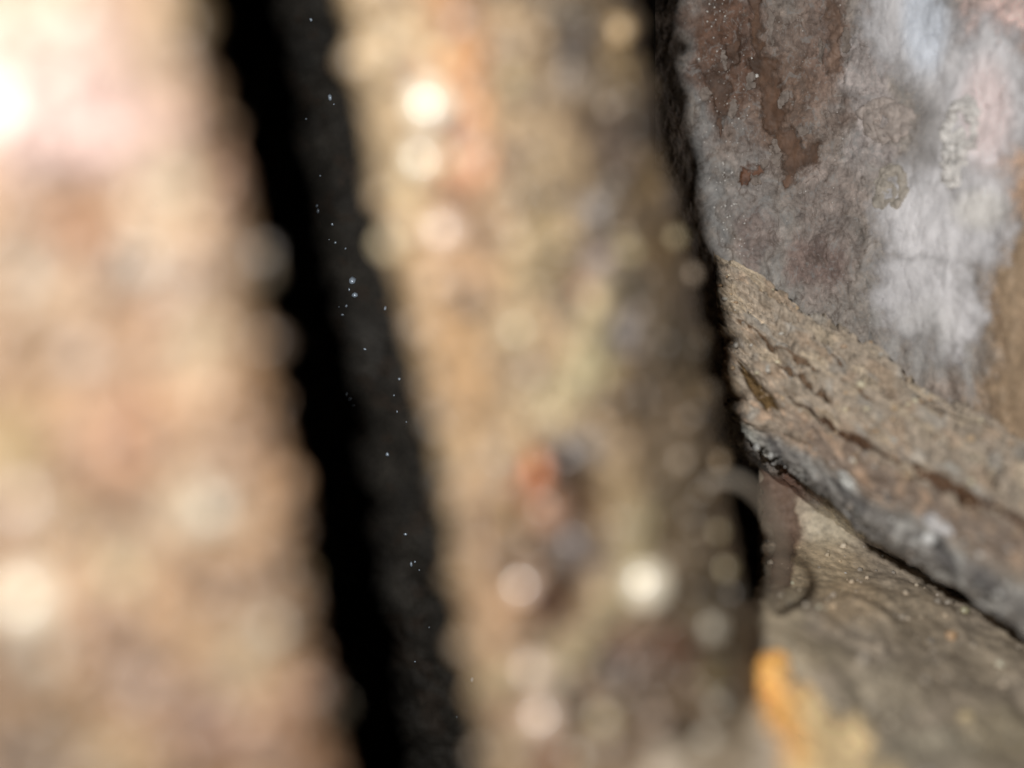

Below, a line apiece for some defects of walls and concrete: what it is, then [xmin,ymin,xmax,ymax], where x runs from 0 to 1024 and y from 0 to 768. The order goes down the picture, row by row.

leakage [862,0,1024,438]